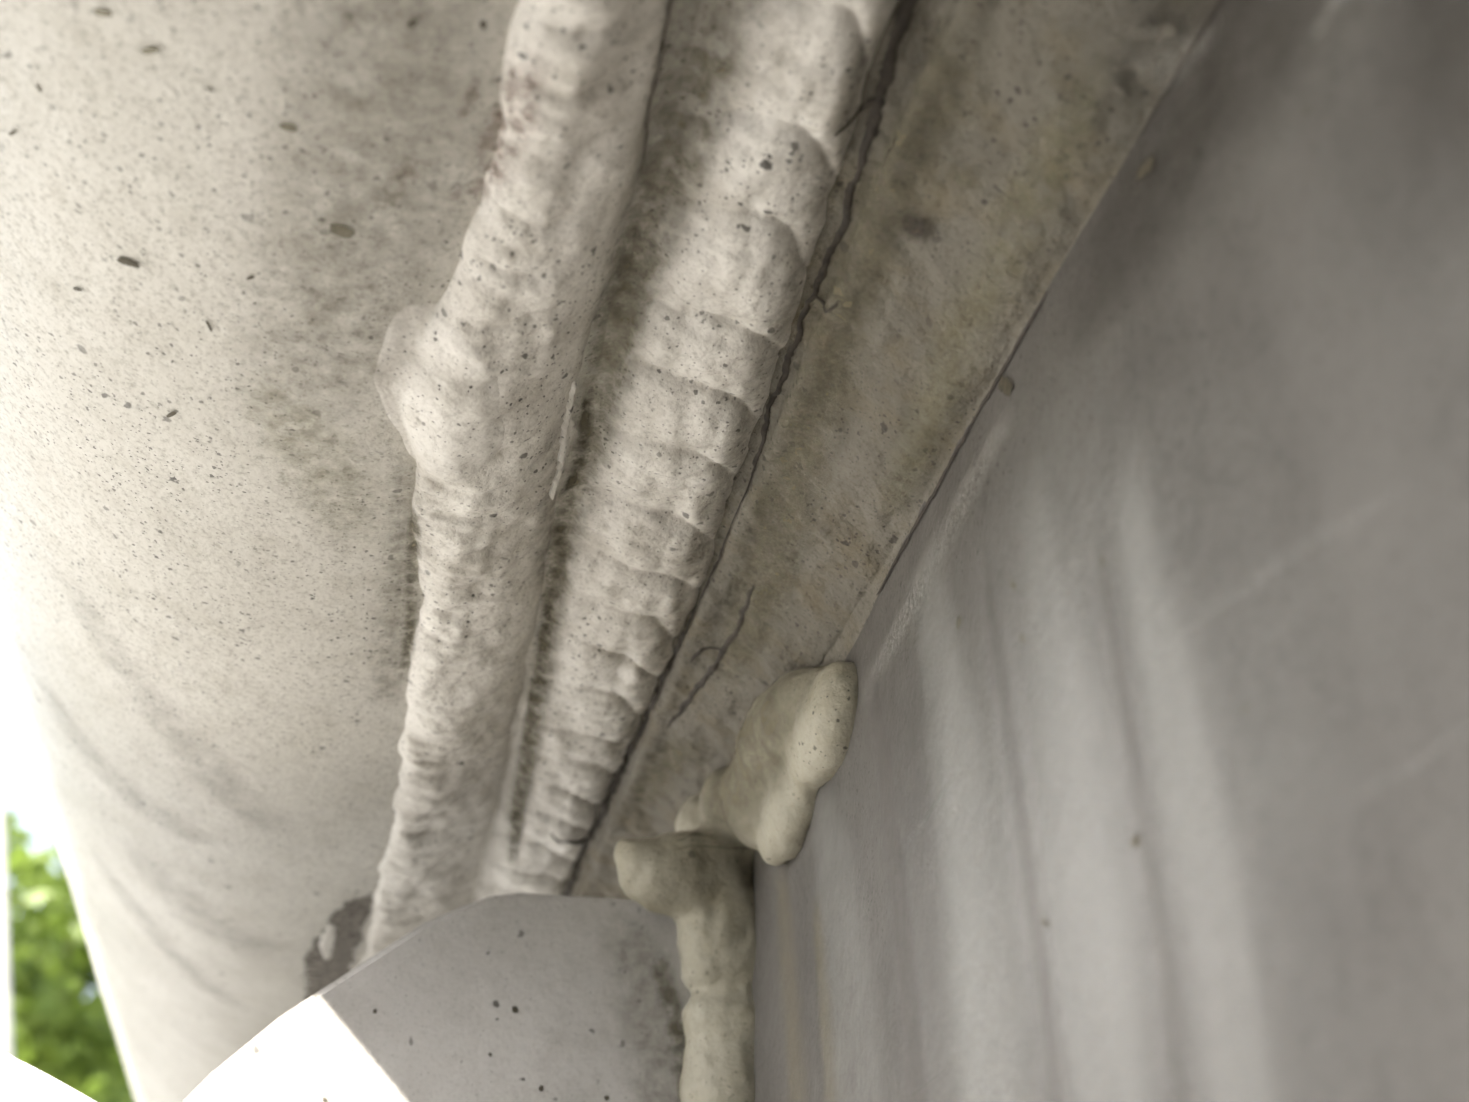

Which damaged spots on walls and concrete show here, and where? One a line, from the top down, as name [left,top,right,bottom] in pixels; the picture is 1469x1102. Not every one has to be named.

crack [1140,0,1223,135]
crack [550,0,919,896]
crack [876,291,1047,595]
damp [403,609,414,666]
peeling [301,897,373,999]